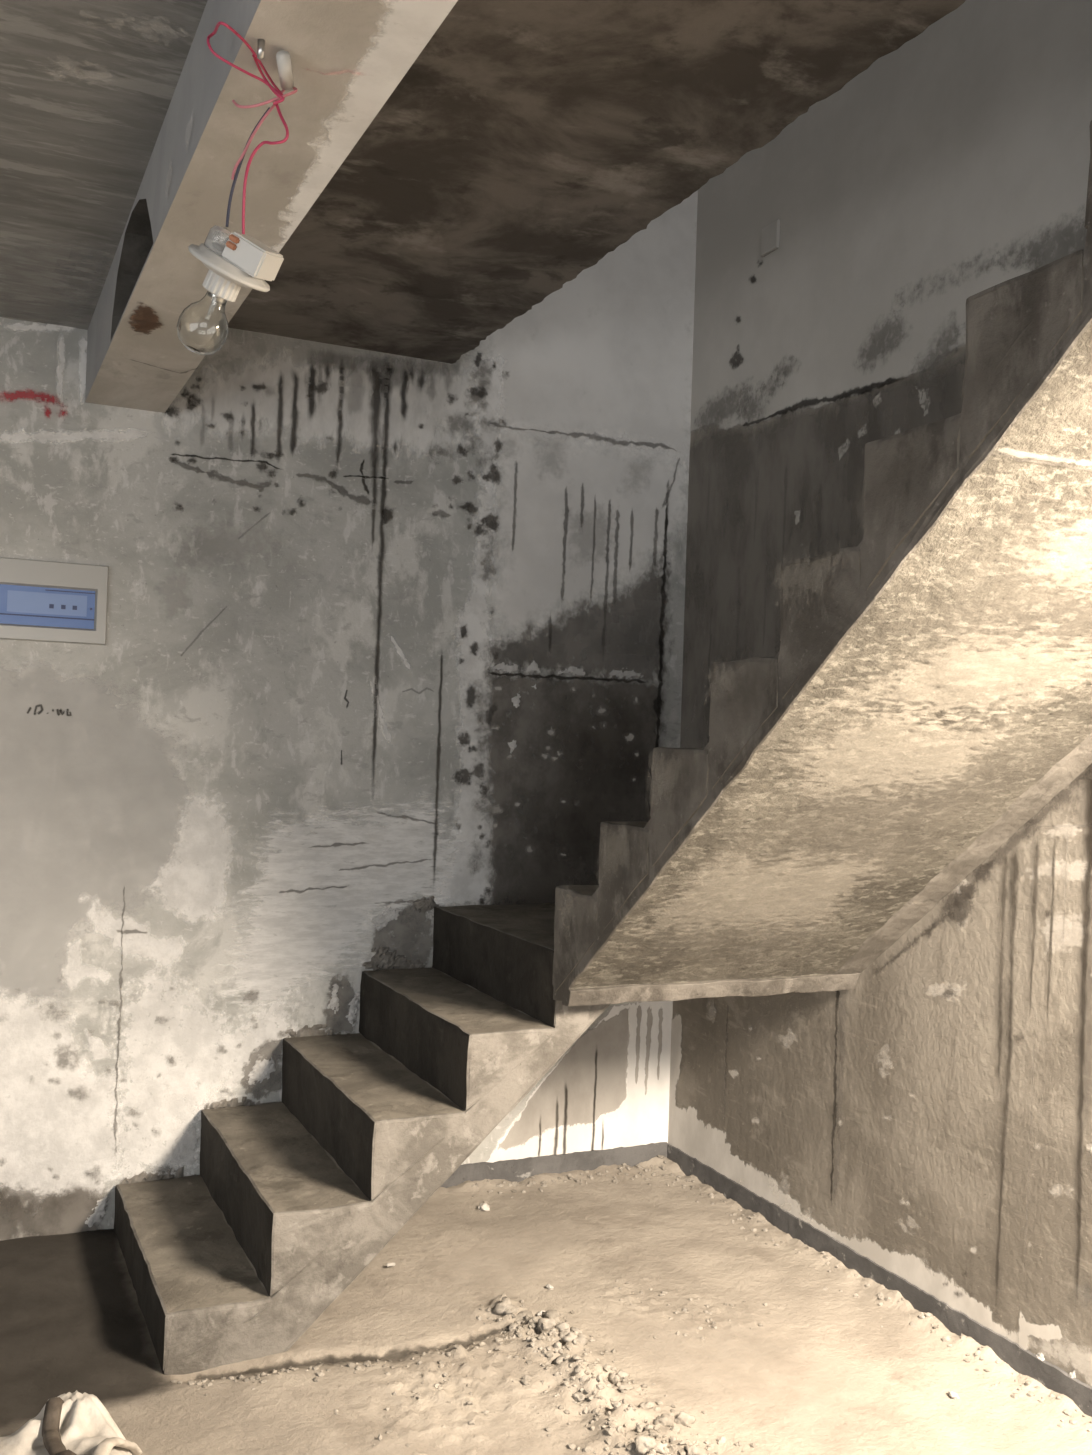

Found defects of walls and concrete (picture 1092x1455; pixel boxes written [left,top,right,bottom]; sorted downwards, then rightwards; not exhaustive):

corrosion [128,303,162,335]
water stain [729,345,743,367]
flaking render [0,357,503,1227]
water stain [165,353,517,773]
water stain [434,485,670,905]
water stain [538,1088,567,1155]
water stain [591,1051,604,1151]
peeling [498,1006,1092,1386]
water stain [876,763,1092,1299]